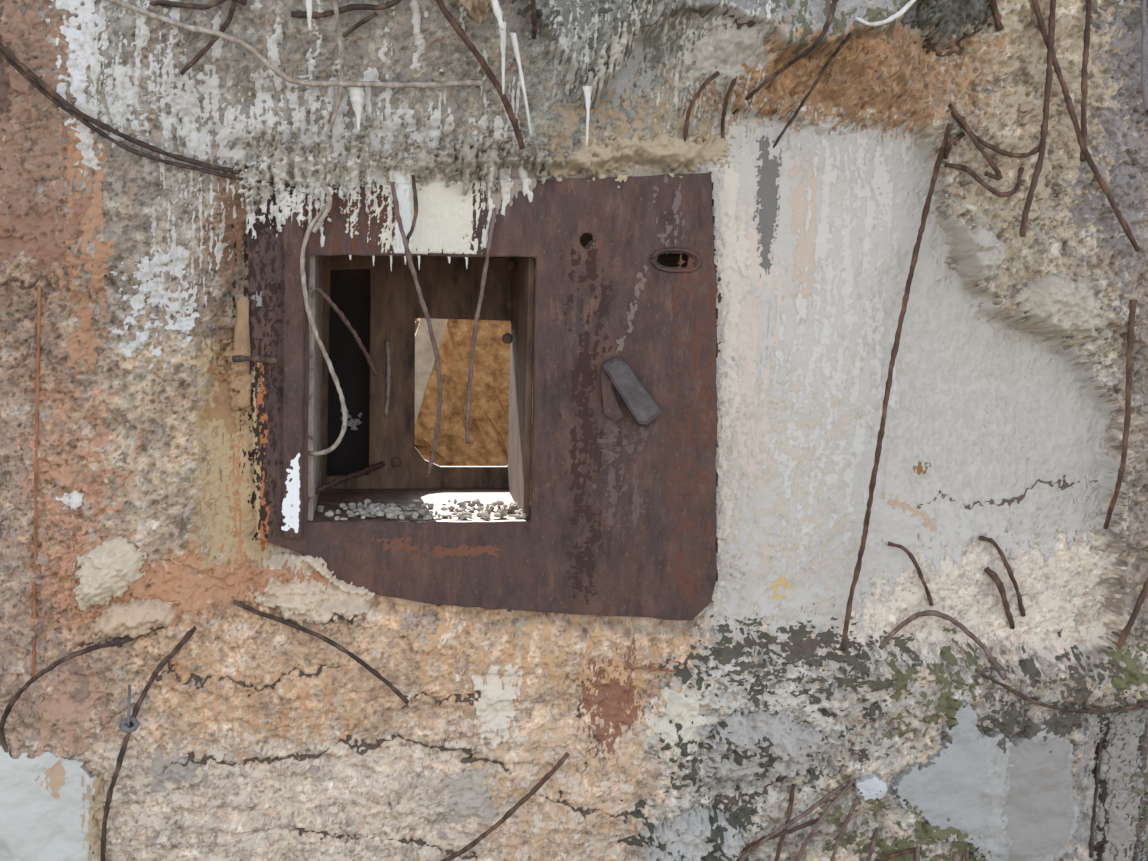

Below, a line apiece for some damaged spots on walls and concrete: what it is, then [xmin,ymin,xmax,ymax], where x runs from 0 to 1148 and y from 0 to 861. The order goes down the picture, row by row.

flaking render [577,0,787,127]
rust [0,0,118,386]
water stain [49,0,1134,655]
rust [371,240,702,861]
flaking render [615,0,1148,861]
crack [918,475,1098,510]
water stain [145,749,212,797]
crack [163,690,511,774]
crack [293,828,477,860]
crack [539,791,650,818]
water stain [633,653,868,804]
water stain [978,730,1076,861]